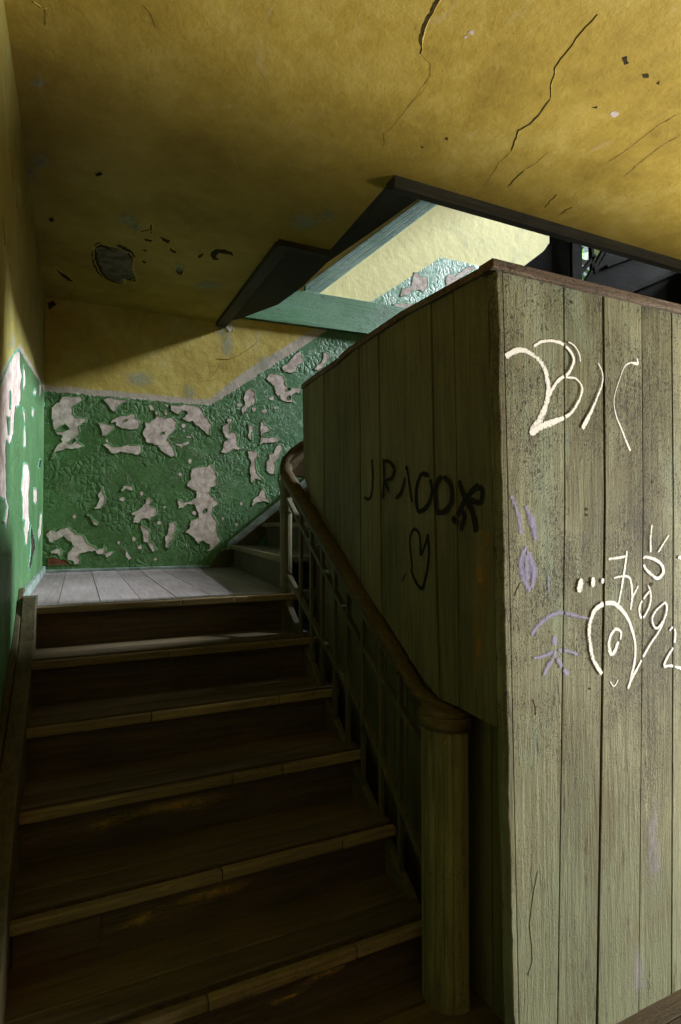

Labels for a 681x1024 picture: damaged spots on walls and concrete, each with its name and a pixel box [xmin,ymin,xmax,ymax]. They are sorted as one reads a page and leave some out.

crack [382,0,441,149]
crack [485,14,598,186]
crack [607,115,680,178]
flaking render [91,223,179,284]
peeling [393,272,428,308]
peeling [445,266,476,286]
peeling [0,348,331,571]